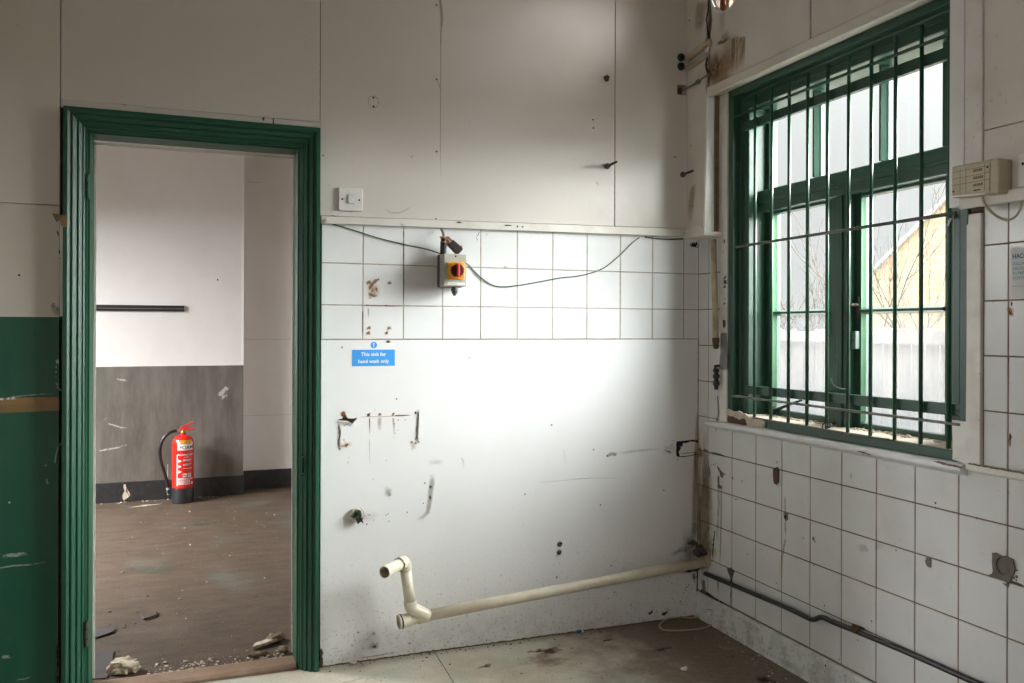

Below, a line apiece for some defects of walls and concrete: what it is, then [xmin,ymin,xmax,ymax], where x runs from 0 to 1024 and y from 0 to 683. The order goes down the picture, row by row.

flaking render [726,409,766,428]
spalling [676,440,699,457]